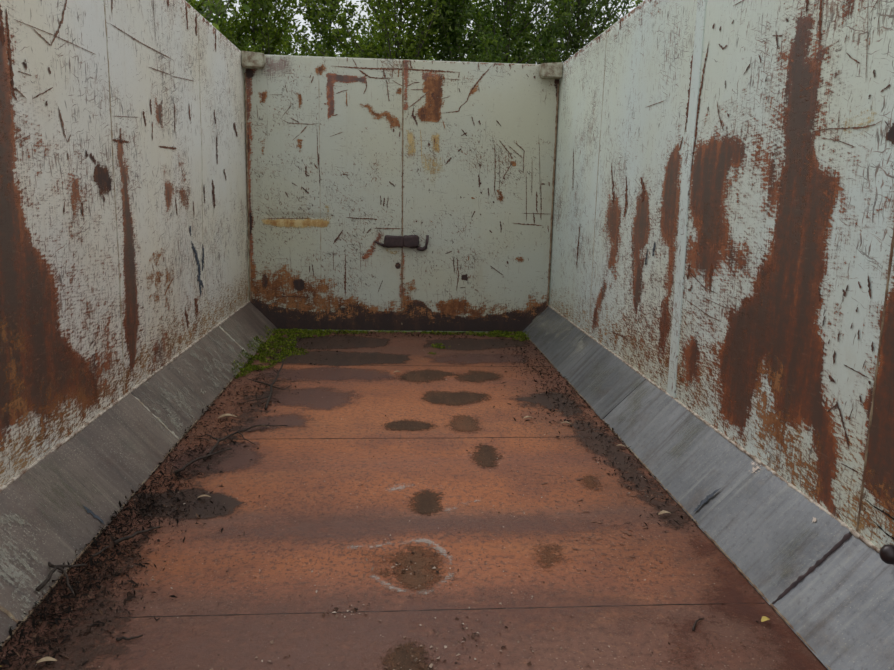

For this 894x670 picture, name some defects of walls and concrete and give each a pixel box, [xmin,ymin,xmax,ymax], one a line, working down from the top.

corrosion [0,0,694,486]
corrosion [676,0,894,548]